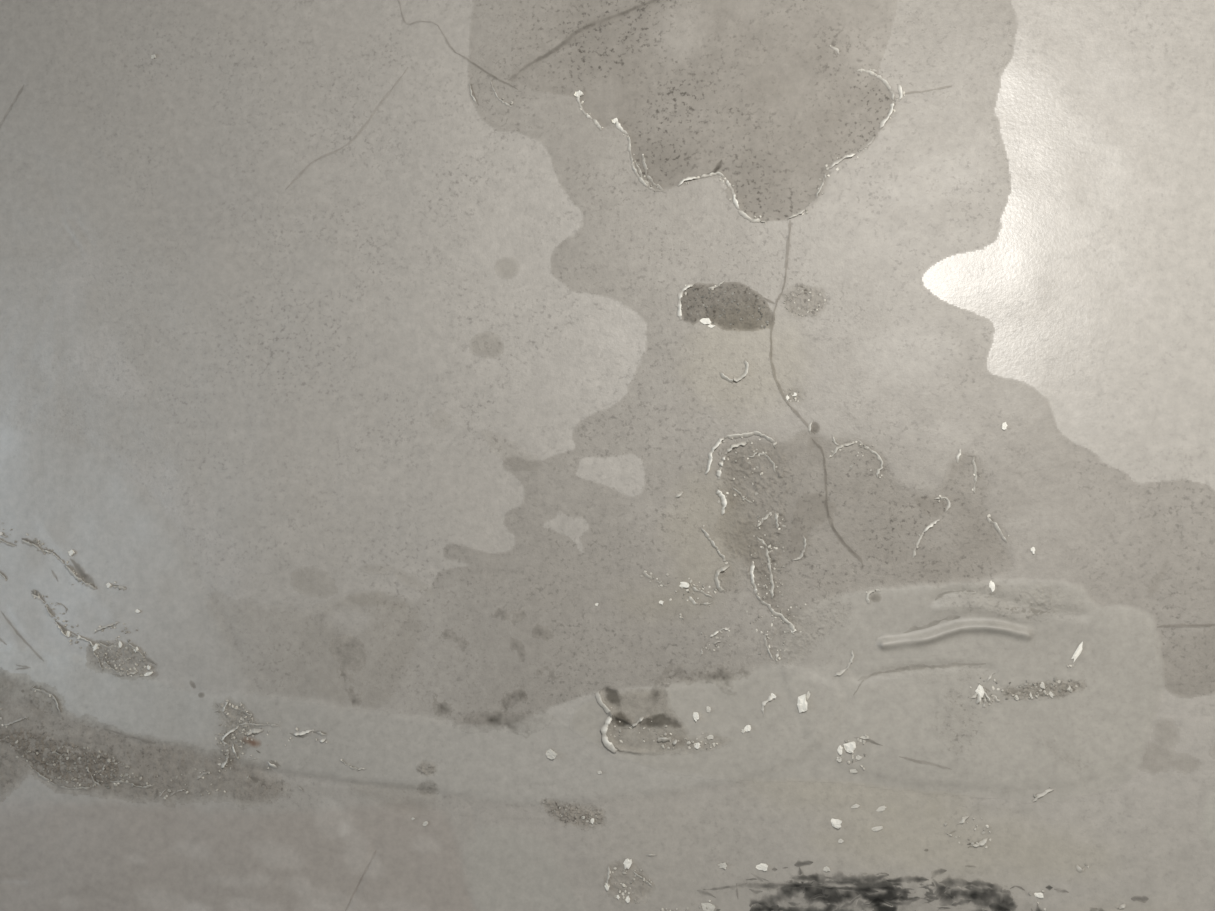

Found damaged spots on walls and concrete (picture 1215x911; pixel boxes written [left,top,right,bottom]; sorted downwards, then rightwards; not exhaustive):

crack [397,0,680,108]
peeling [512,0,905,224]
spalling [676,279,828,332]
leakage [206,0,1215,738]
crack [764,220,863,569]
peeling [0,523,126,591]
peeling [640,428,1016,669]
peeling [31,590,159,682]
spalling [0,667,327,810]
spalling [594,685,751,756]
spalling [968,641,1087,713]
leakage [1138,717,1215,775]